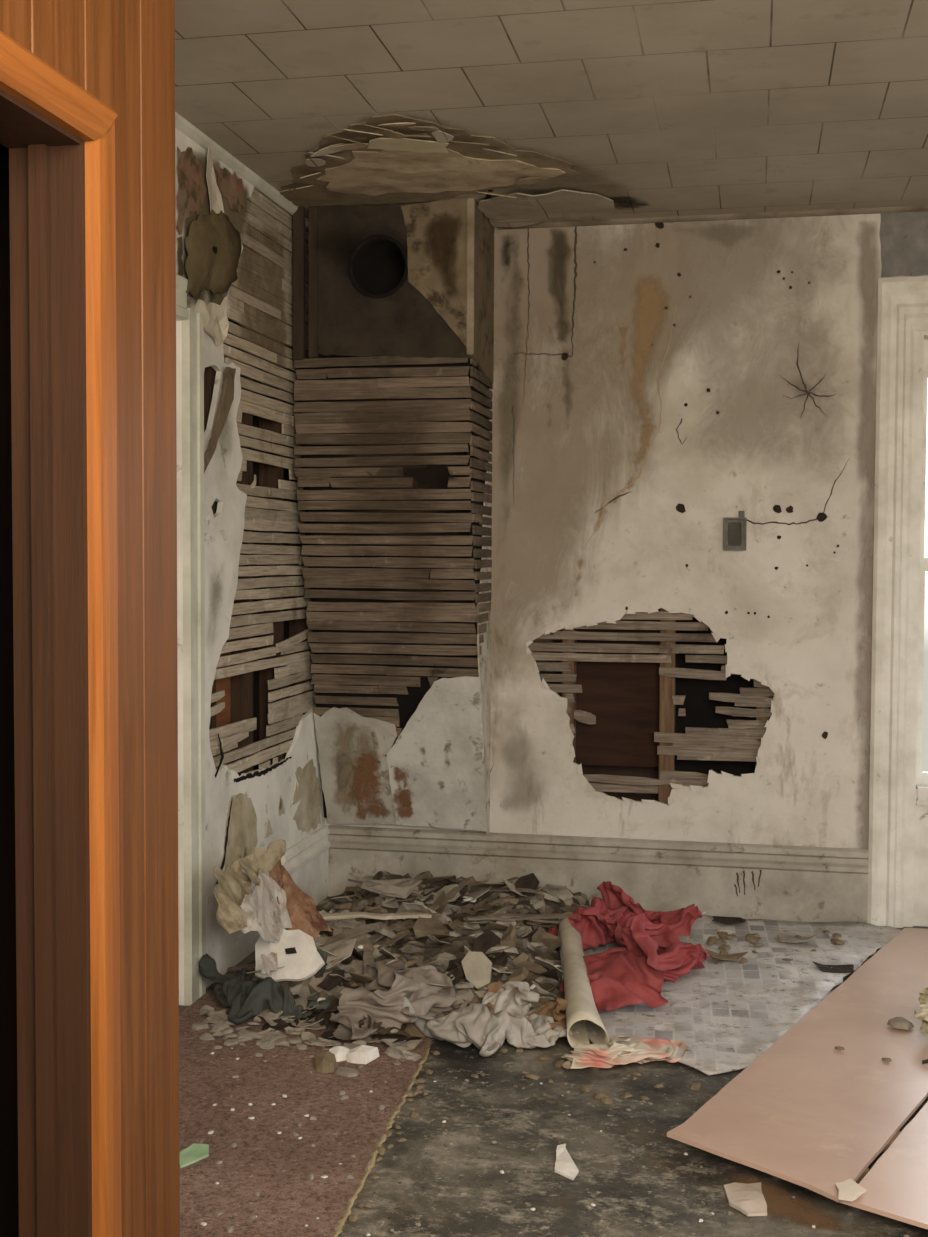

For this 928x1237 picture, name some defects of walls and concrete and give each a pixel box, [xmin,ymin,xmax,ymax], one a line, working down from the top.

damp [609,197,646,208]
flaking render [194,122,517,777]
damp [489,221,772,669]
crack [779,345,835,420]
spalling [525,608,775,804]
peeling [216,759,321,884]
corrosion [349,754,413,819]